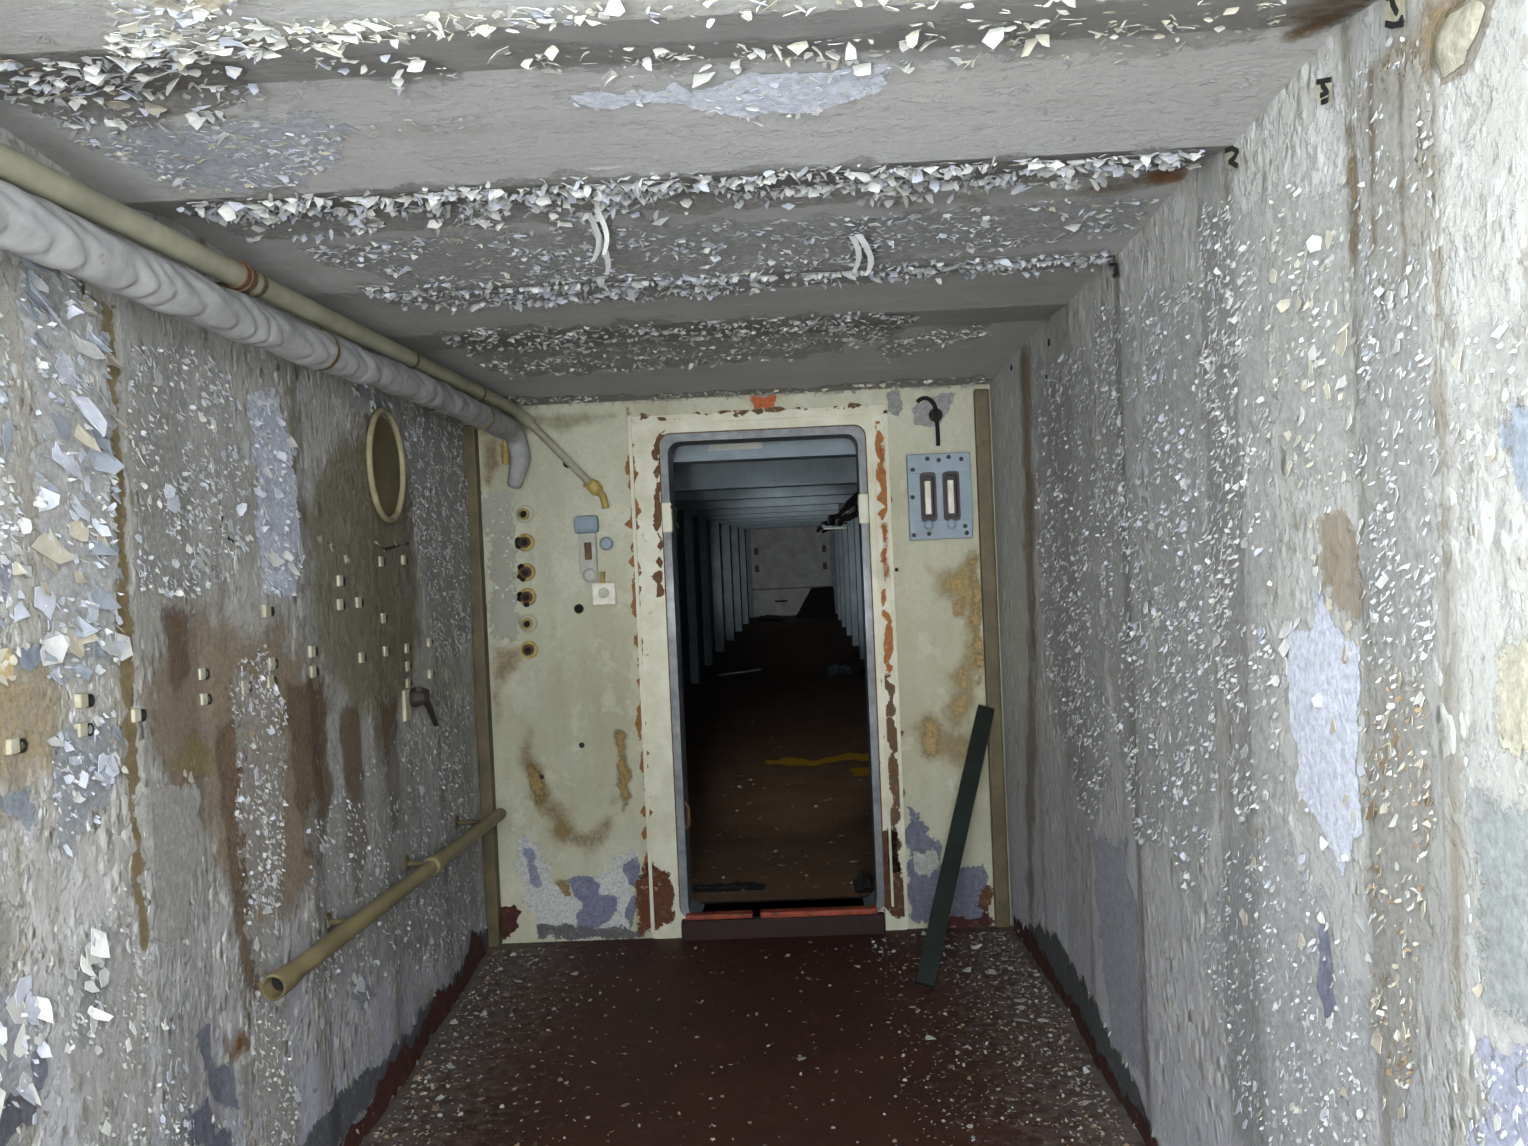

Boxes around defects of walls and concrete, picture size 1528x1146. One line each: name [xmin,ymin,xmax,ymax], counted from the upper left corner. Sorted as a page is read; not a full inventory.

water stain [1287,0,1369,39]
peeling [0,0,1257,428]
peeling [0,705,128,858]
peeling [0,256,305,688]
peeling [228,644,489,1146]
water stain [309,427,417,736]
peeling [344,379,516,669]
peeling [514,834,645,941]
rust [625,394,910,936]
peeling [905,806,943,924]
peeling [950,864,989,920]
peeling [1018,36,1528,1146]